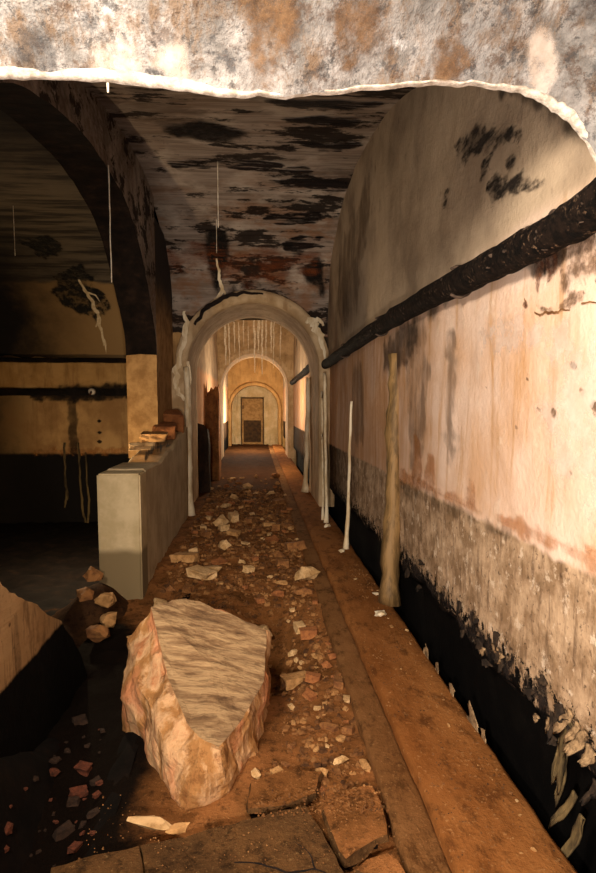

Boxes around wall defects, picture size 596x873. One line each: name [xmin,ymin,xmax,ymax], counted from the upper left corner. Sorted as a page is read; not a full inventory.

mould [51,264,110,321]
damp [214,259,226,299]
flaking render [403,544,596,858]
crack [234,842,326,873]